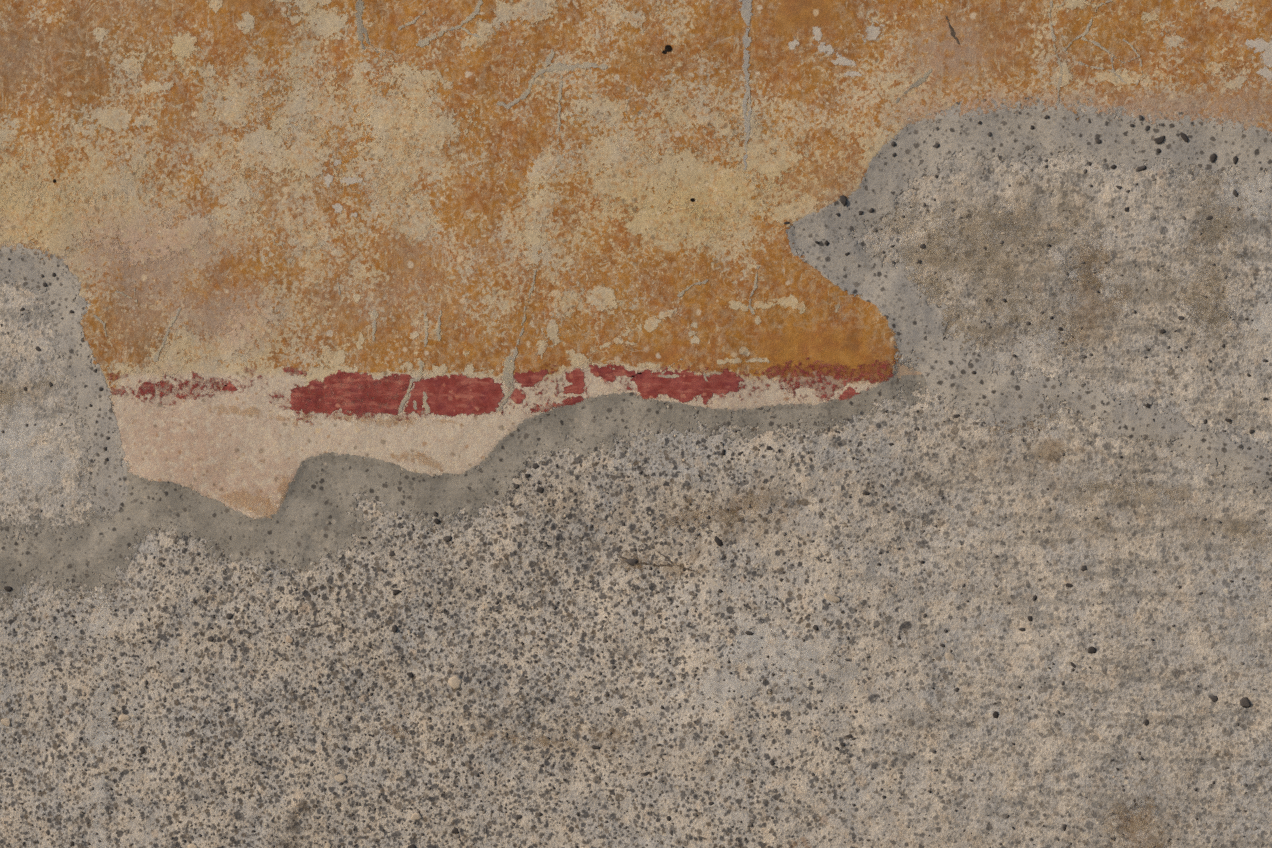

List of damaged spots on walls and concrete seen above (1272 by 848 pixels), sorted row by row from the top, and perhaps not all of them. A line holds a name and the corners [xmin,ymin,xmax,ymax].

peeling [93,27,108,49]
peeling [206,0,223,14]
peeling [236,12,254,35]
peeling [271,0,357,41]
crack [739,0,753,170]
peeling [516,94,824,272]
peeling [0,31,484,542]
peeling [535,272,622,361]
peeling [728,294,807,325]
spalling [815,101,1272,467]
spalling [0,303,1272,848]